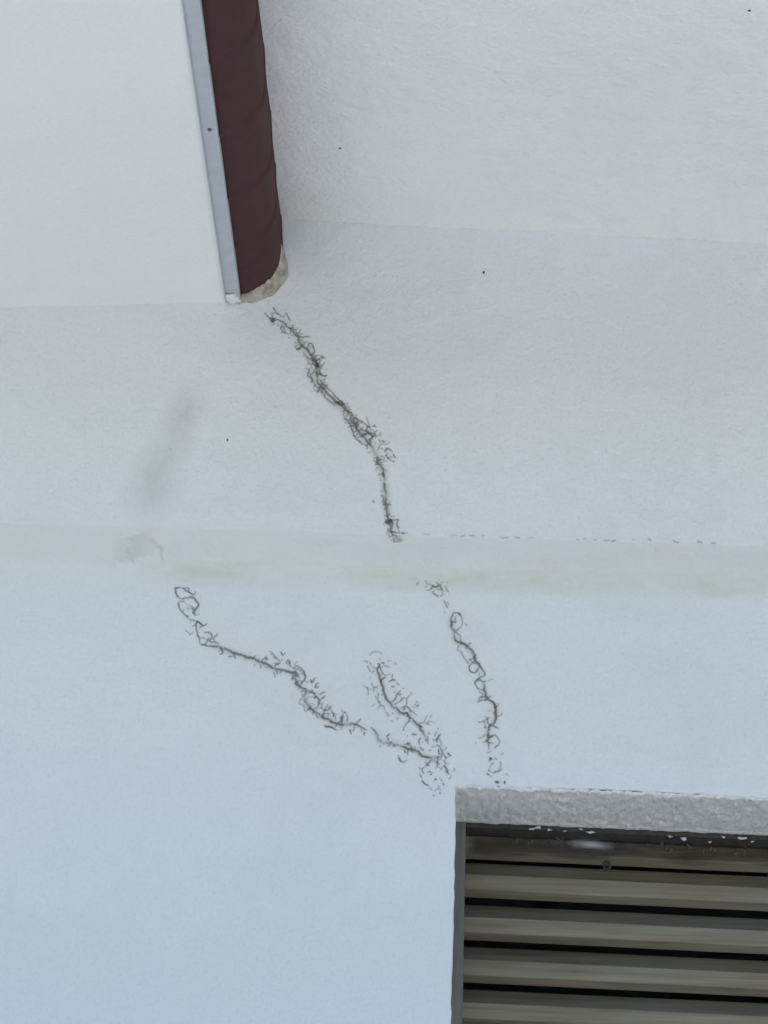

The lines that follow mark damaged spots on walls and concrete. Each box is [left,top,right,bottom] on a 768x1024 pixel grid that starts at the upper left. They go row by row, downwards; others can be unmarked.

crack [265,308,404,542]
crack [175,587,451,796]
crack [431,582,506,784]